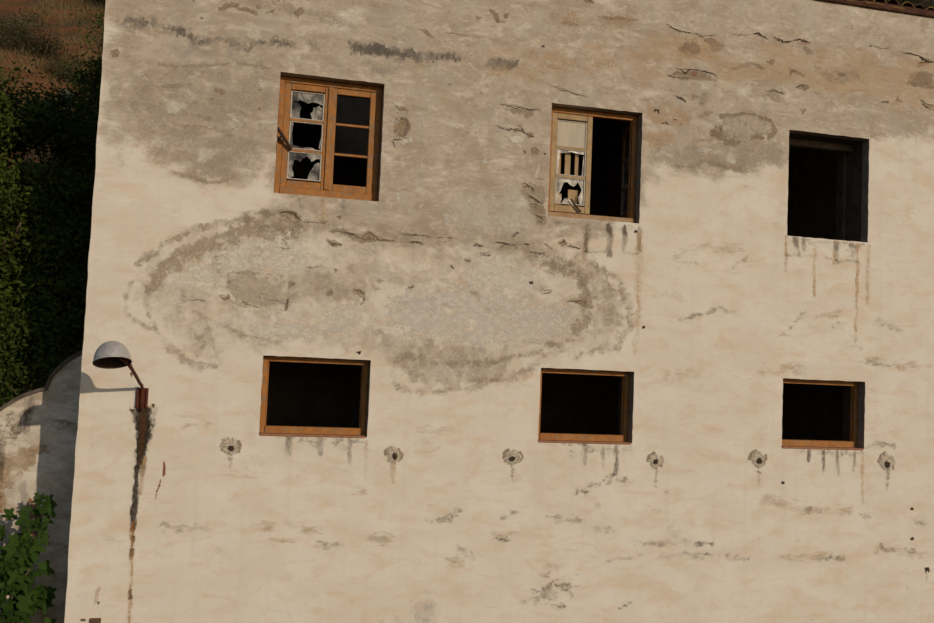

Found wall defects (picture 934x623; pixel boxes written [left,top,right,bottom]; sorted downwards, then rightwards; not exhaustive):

leakage [349,40,432,61]
spalling [668,67,715,80]
peeling [521,177,546,224]
spalling [279,208,394,247]
corrosion [128,404,155,605]